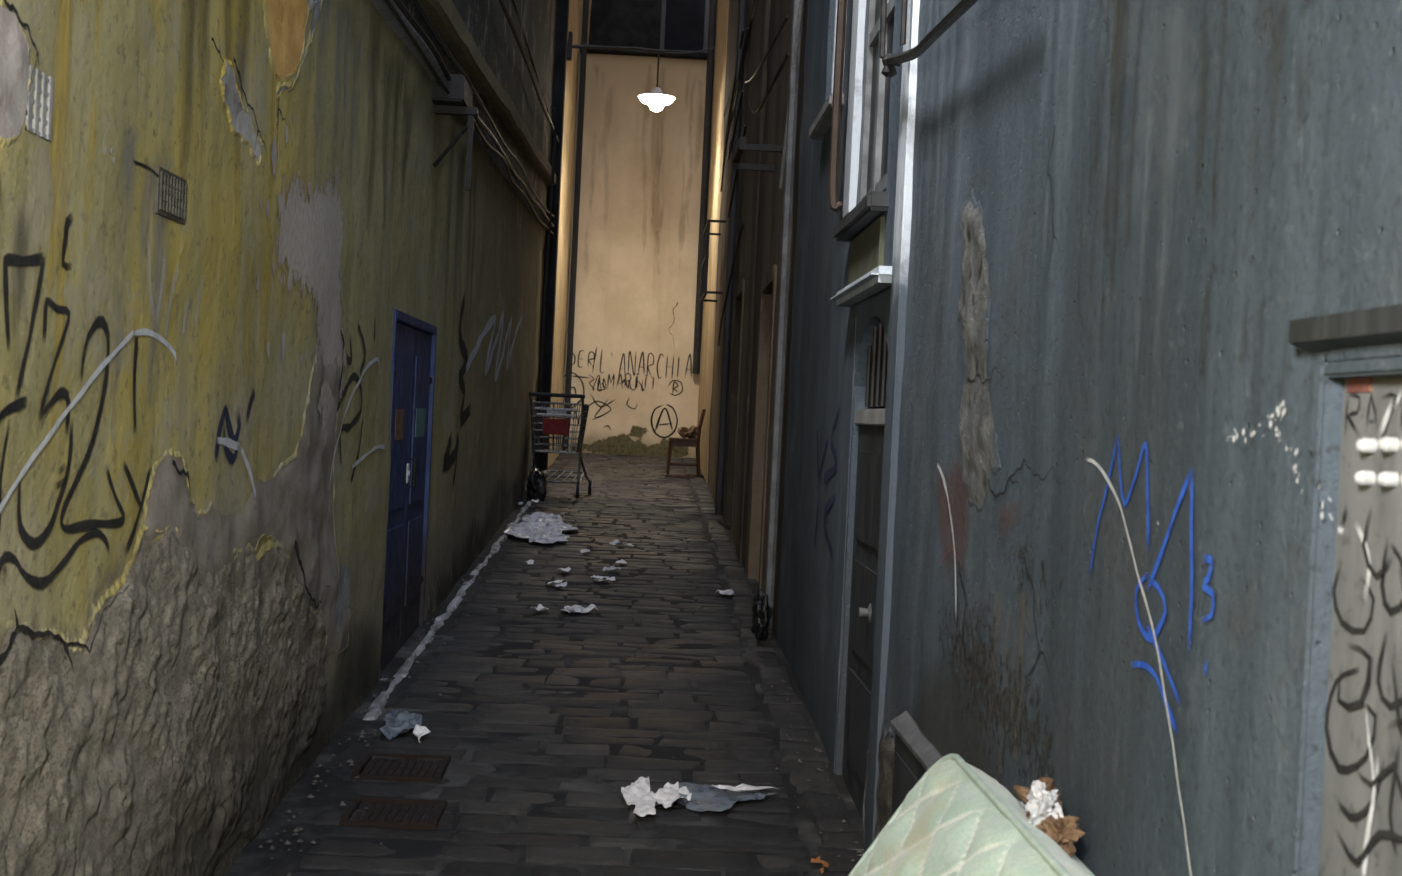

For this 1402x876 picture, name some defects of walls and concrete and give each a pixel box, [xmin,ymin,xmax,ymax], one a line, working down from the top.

peeling [0,0,31,148]
peeling [263,0,323,101]
spalling [0,58,351,876]
spalling [957,188,1001,512]